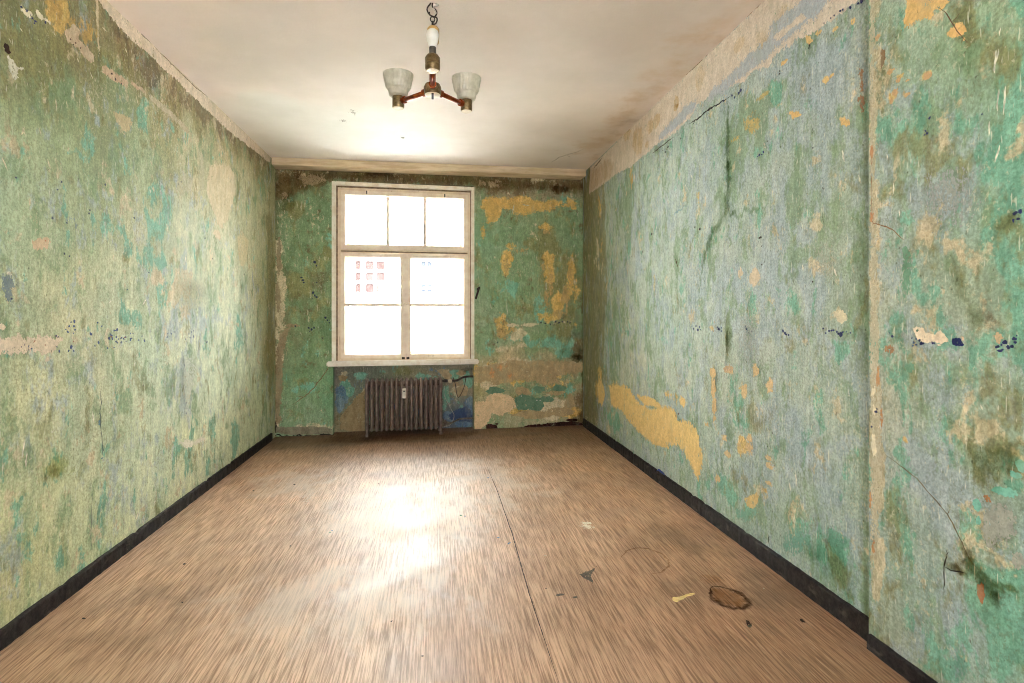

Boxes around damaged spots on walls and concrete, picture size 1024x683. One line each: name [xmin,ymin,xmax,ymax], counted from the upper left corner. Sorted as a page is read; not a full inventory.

peeling [904,0,950,28]
peeling [947,22,967,41]
crack [653,89,742,153]
peeling [480,196,577,239]
peeling [589,0,910,595]
peeling [0,319,76,362]
flaking render [911,326,964,347]
peeling [437,358,583,429]
crack [885,454,976,589]